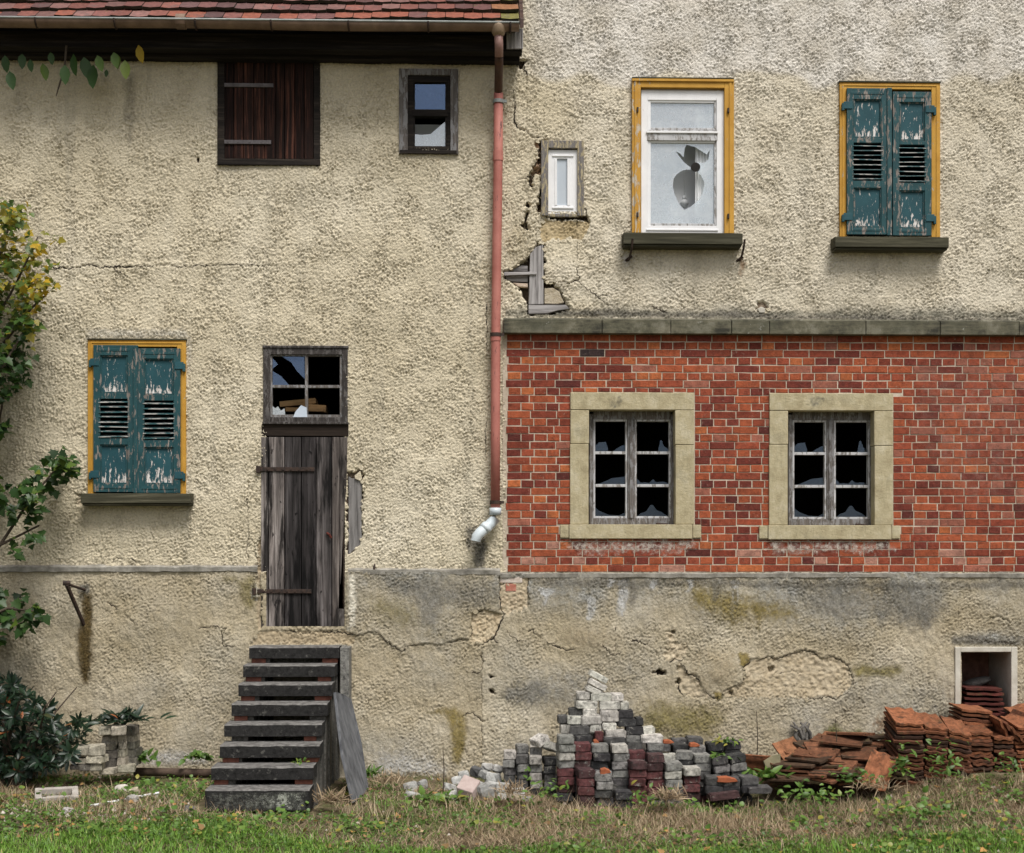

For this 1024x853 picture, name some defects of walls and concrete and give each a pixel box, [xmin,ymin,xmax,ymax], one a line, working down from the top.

crack [513,65,544,186]
peeling [530,140,541,176]
crack [0,263,263,276]
spalling [503,196,590,316]
spalling [346,466,364,554]
peeling [470,577,530,644]
leakage [541,579,1024,622]
crack [290,578,575,763]